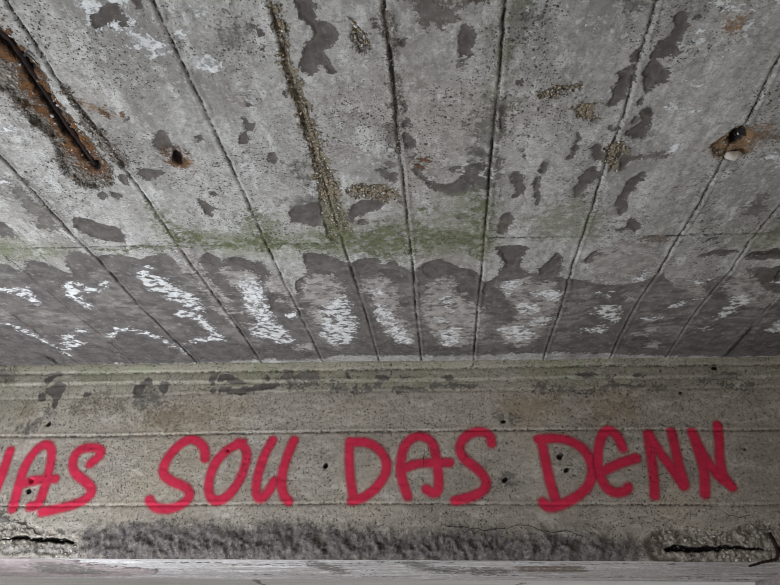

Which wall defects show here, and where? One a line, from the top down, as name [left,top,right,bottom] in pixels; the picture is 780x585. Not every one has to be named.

water stain [707,0,759,38]
water stain [196,53,232,84]
water stain [463,95,511,180]
water stain [0,176,62,232]
water stain [740,193,772,217]
water stain [0,222,18,239]
water stain [0,239,780,441]
crack [1,517,53,535]